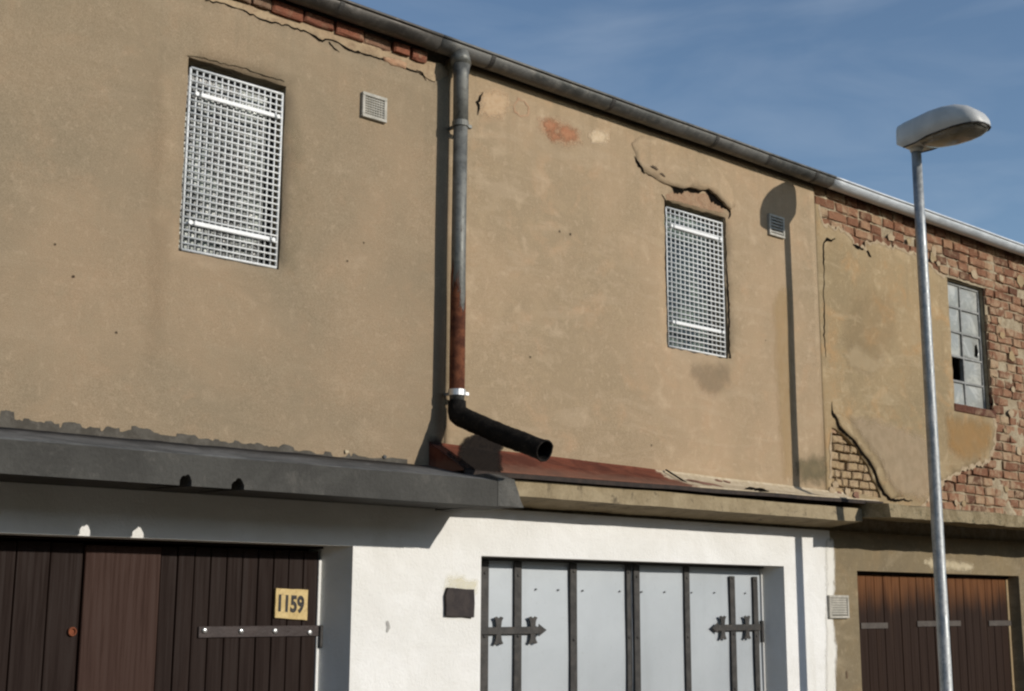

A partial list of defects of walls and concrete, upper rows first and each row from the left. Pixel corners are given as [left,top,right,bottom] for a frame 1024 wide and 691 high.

spalling [209,0,448,82]
spalling [540,118,609,145]
spalling [666,192,725,214]
rust [449,263,466,389]
crack [823,238,835,354]
spalling [814,186,1024,516]
peeling [0,410,407,464]